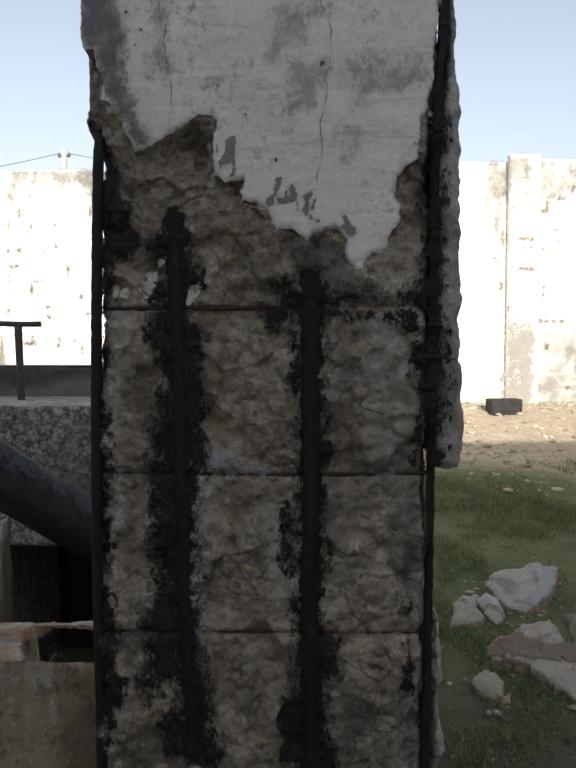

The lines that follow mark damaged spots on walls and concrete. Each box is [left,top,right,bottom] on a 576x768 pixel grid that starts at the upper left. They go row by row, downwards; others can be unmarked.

crack [158,2,172,125]
spalling [433,0,447,83]
spalling [87,56,440,768]